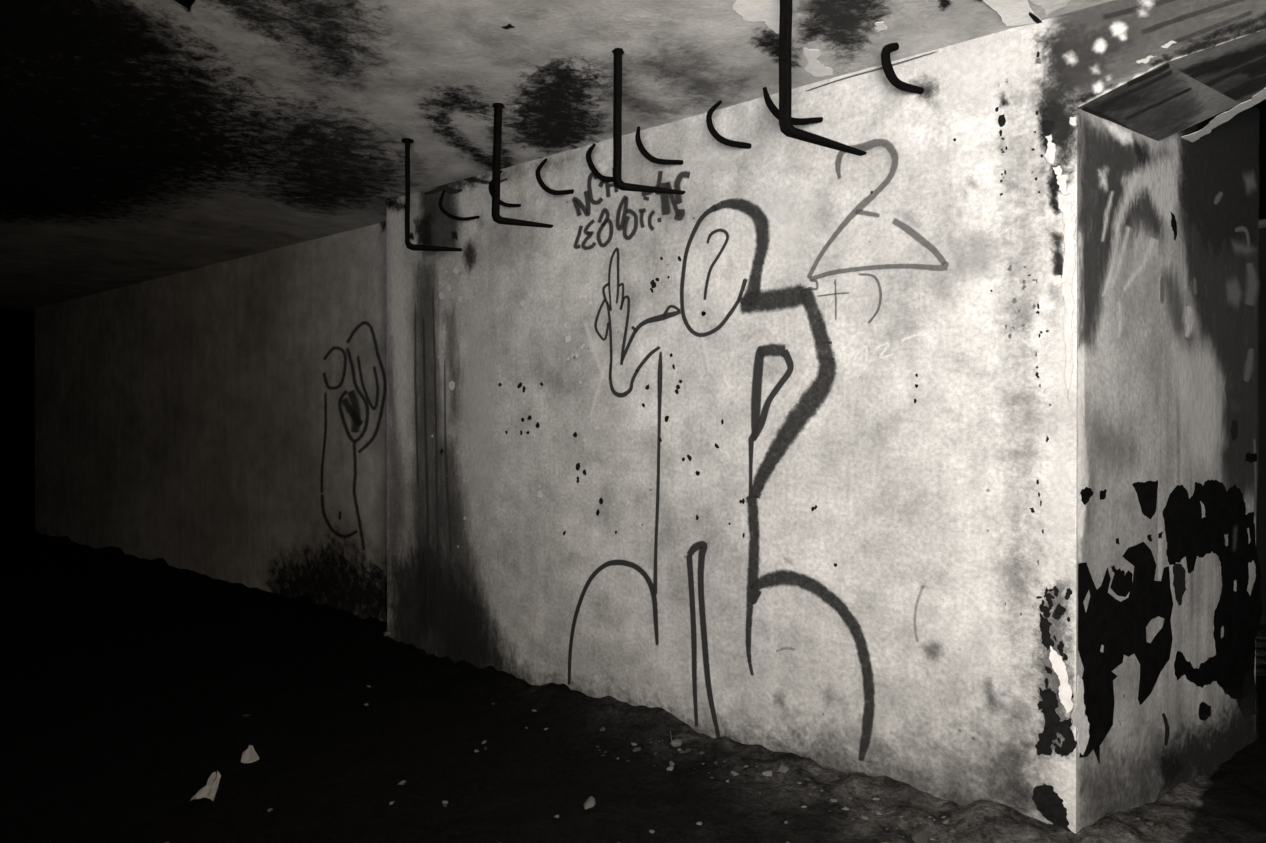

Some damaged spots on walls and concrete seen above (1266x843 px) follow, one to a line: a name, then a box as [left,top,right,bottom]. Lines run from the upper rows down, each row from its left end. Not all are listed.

peeling [1030,0,1071,17]
peeling [1254,99,1266,220]
peeling [1035,480,1263,764]